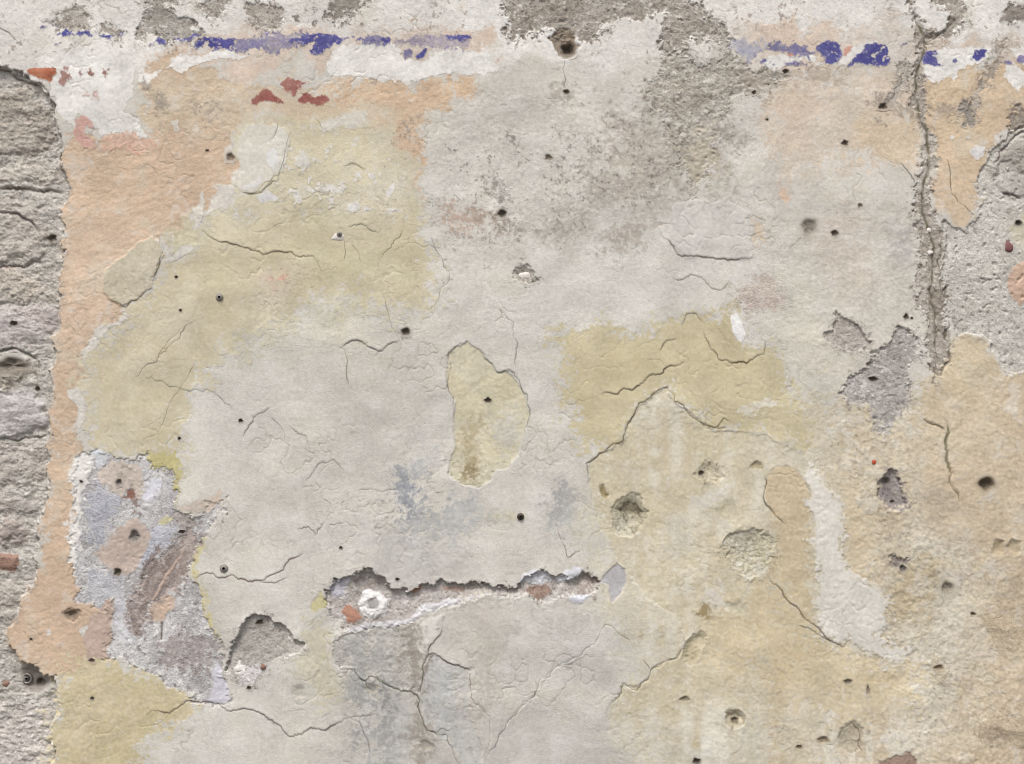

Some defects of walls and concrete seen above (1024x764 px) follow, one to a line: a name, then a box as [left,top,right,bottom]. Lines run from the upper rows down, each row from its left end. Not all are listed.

flaking render [498,0,806,186]
crack [204,231,321,271]
crack [888,0,974,387]
flaking render [941,0,1024,378]
peeling [0,61,456,764]
crack [136,322,344,480]
crack [342,300,399,385]
crack [586,313,766,483]
peeling [446,196,974,764]
crack [762,478,785,524]
crack [335,624,683,764]
crack [768,577,848,647]